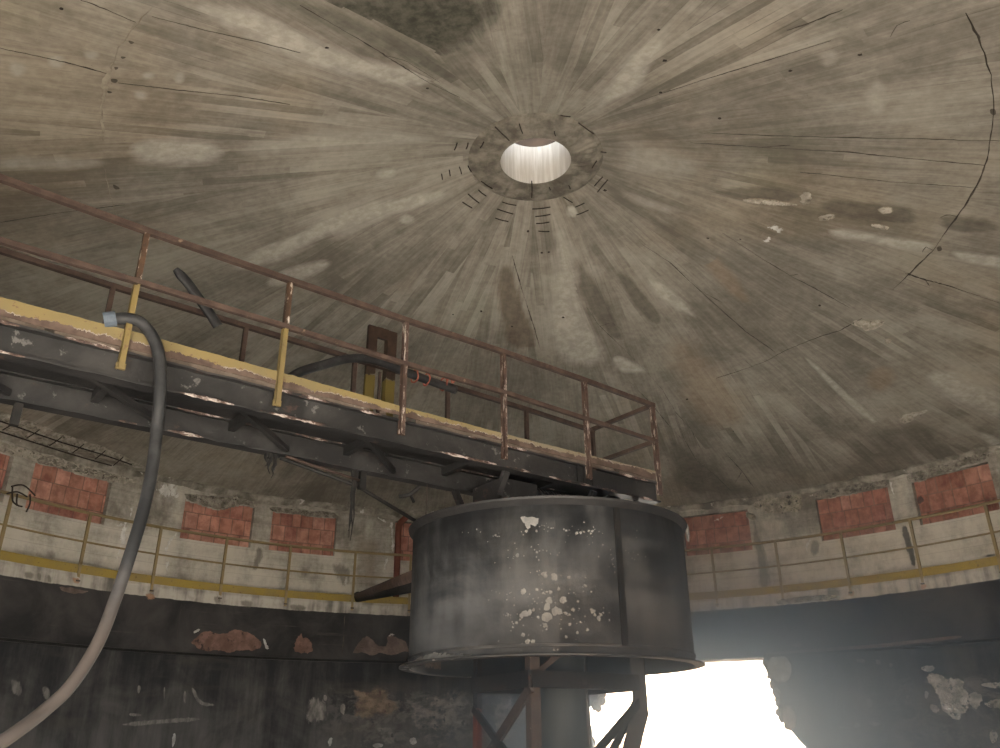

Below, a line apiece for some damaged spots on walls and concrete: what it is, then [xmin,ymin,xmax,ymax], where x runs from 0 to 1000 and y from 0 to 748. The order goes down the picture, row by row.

damp [183,0,515,94]
crack [690,14,999,303]
spalling [743,191,813,206]
spalling [870,206,893,230]
crack [648,233,862,378]
spalling [0,410,146,485]
flaking render [920,665,1000,724]